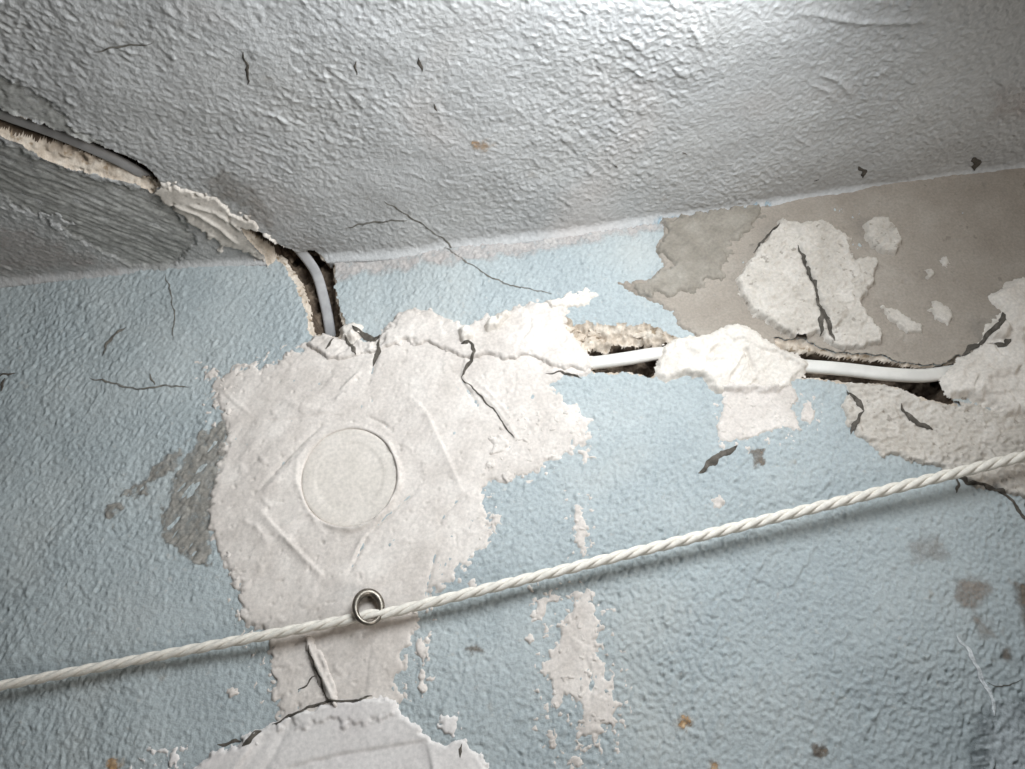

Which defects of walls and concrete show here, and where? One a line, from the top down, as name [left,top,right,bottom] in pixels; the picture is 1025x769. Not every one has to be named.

crack [98,43,152,53]
flaking render [564,168,1025,365]
crack [165,275,175,336]
crack [0,373,15,391]
spalling [591,361,657,378]
damp [105,448,182,519]
peeling [563,490,595,560]
crack [955,476,1025,520]
crack [217,645,372,747]
peeling [402,607,437,702]
peeling [437,711,462,737]
peeling [524,578,633,769]